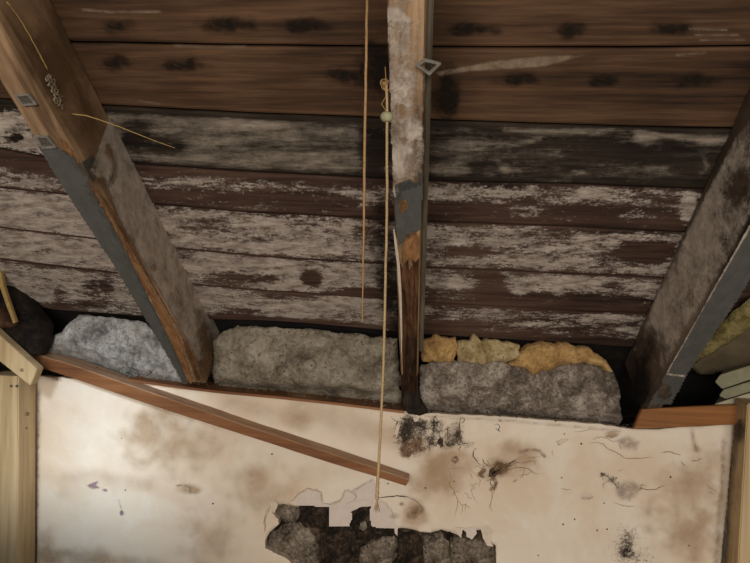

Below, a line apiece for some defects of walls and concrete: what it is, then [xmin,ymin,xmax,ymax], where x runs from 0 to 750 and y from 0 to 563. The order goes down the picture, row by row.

leakage [370,207,399,338]
flaking render [264,479,496,563]
leakage [392,415,469,489]
crack [449,448,553,517]